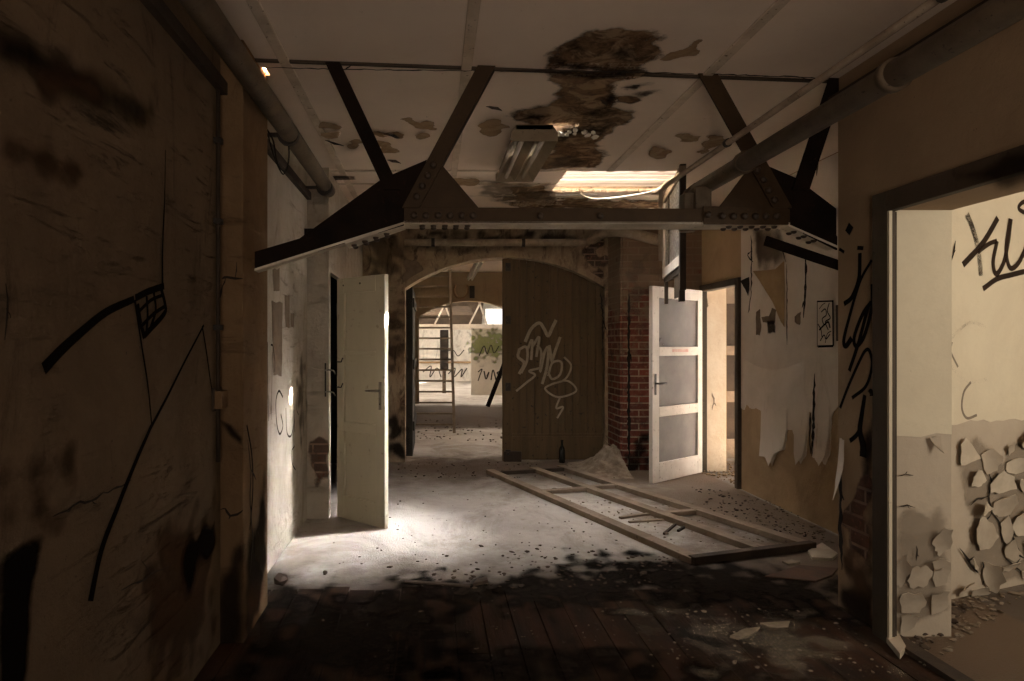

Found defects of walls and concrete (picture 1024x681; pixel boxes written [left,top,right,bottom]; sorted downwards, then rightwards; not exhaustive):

peeling [660,39,702,61]
leakage [512,28,665,170]
peeling [319,122,362,149]
peeling [373,117,437,164]
peeling [675,133,725,154]
peeling [649,146,672,172]
leakage [481,181,658,208]
spalling [515,185,651,194]
peeling [756,308,776,335]
flaking render [308,437,330,487]
peeling [833,438,844,499]
peeling [959,437,1024,597]